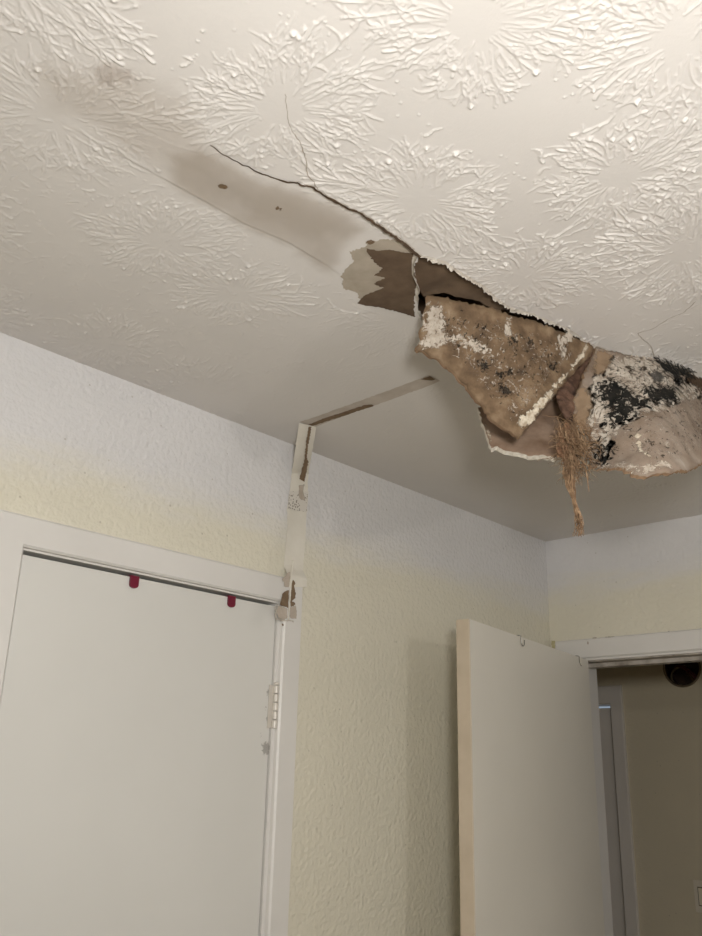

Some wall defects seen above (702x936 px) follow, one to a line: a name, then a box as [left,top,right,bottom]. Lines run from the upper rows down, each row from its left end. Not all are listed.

crack [210,95,422,258]
spalling [417,291,580,340]
leakage [585,356,702,468]
peeling [275,375,439,626]